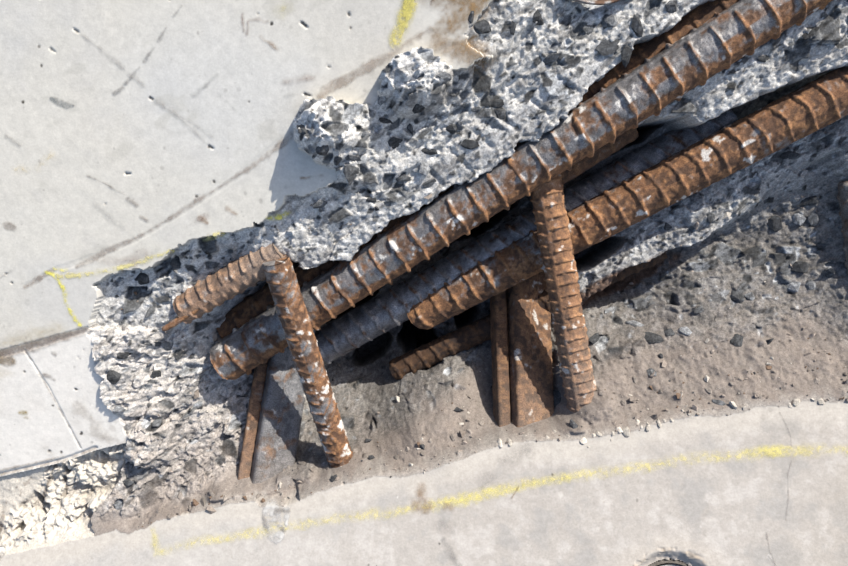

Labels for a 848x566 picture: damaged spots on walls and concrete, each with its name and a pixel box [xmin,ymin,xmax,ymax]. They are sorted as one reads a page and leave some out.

rust [437,35,486,66]
rust [447,0,488,31]
spalling [294,0,848,366]
spalling [162,242,283,338]
spalling [209,305,288,380]
spalling [389,314,491,380]
spalling [490,271,554,427]
spalling [238,346,306,484]